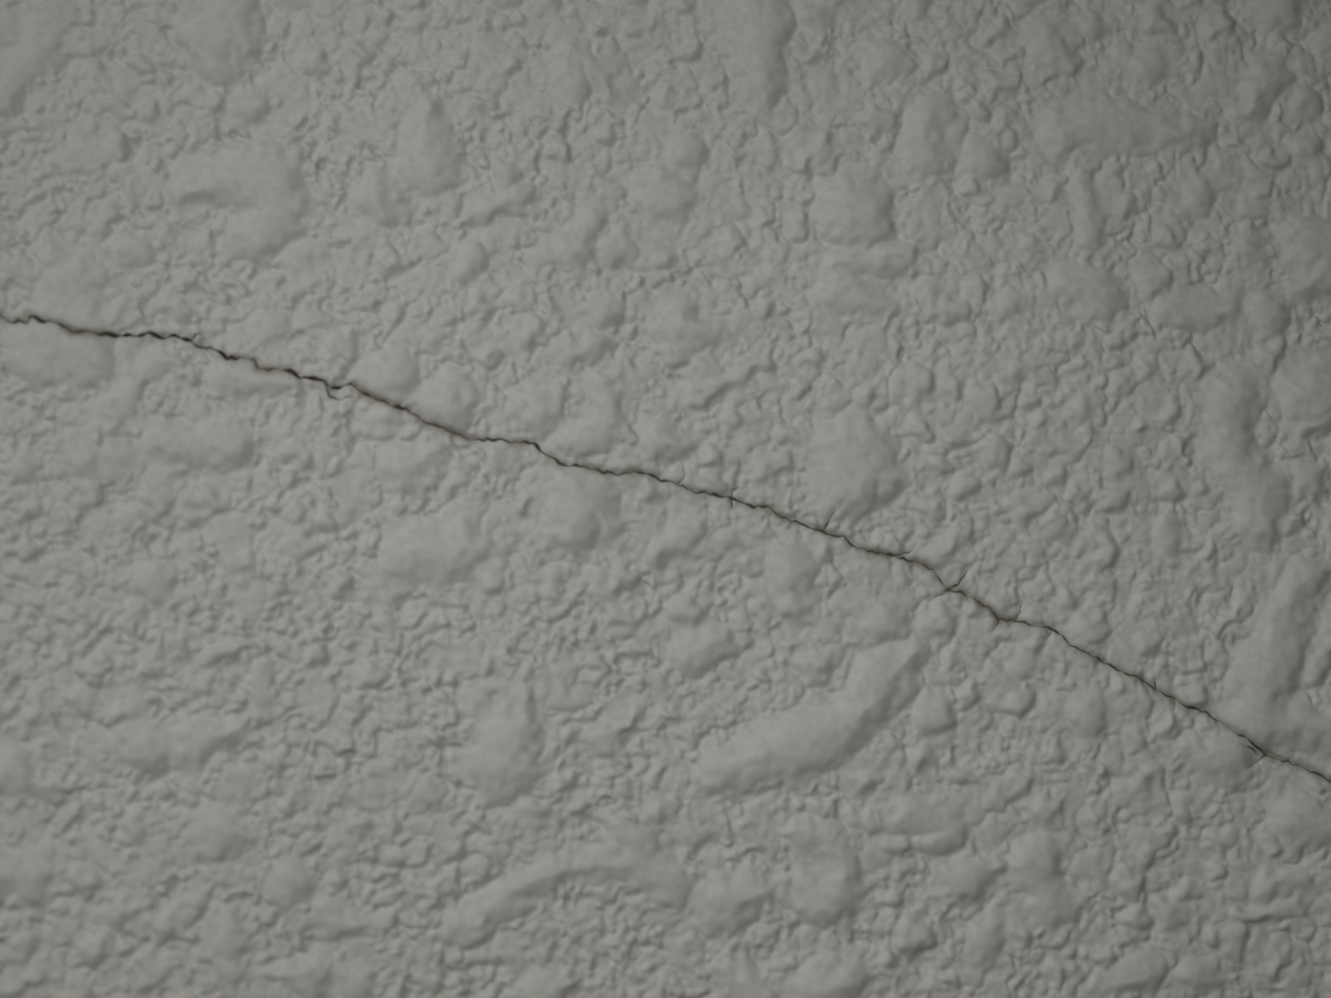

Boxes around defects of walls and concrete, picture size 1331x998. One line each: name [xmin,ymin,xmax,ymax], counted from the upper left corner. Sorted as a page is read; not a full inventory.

crack [0,314,1331,782]